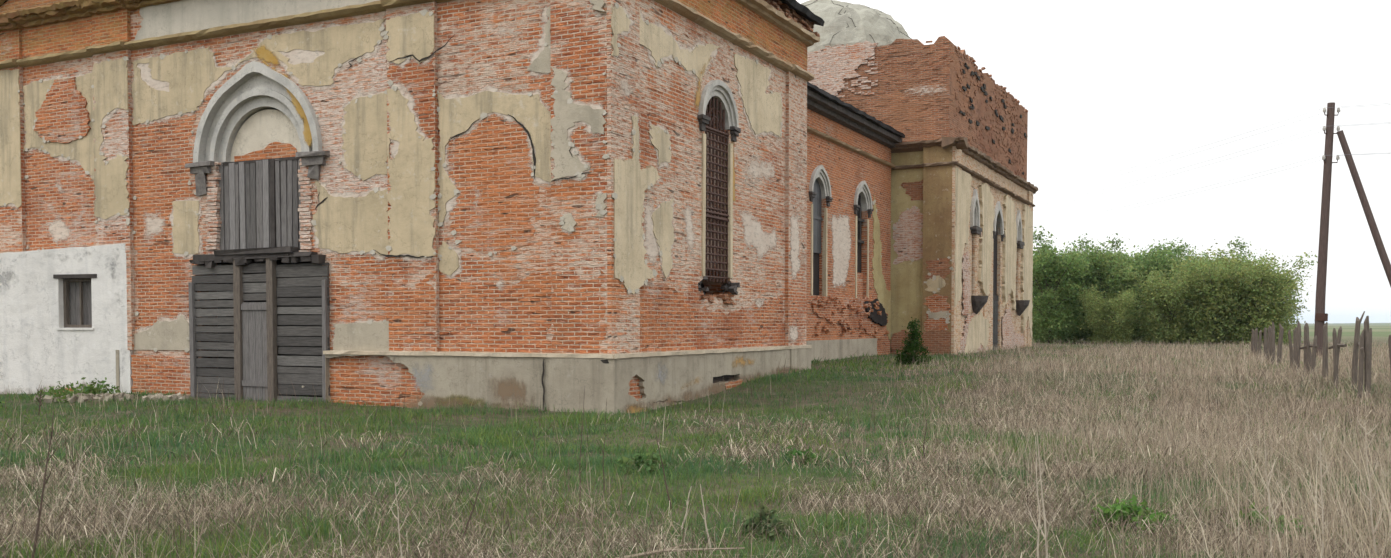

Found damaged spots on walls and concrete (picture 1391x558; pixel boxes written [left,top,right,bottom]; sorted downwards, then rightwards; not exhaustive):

spalling [807,41,878,98]
spalling [959,63,1027,175]
peeling [25,100,204,329]
peeling [234,26,785,408]
spalling [811,180,1025,355]
spalling [131,337,191,396]